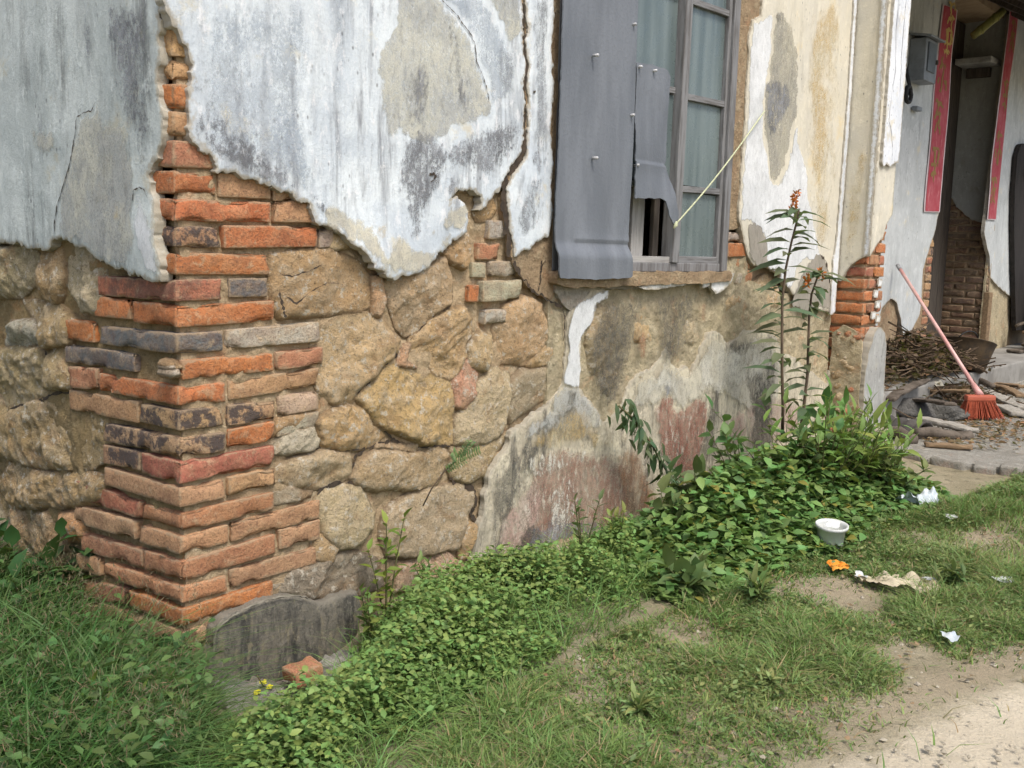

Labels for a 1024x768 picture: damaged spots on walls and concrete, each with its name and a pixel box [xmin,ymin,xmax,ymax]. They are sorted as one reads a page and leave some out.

crack [54,103,95,231]
spalling [0,0,560,711]
leakage [400,126,518,236]
crack [500,3,566,341]
leakage [493,391,600,557]
spalling [530,0,900,435]
peeling [634,338,797,478]
leakage [747,363,775,458]
spalling [912,239,934,336]
spalling [941,205,1011,349]